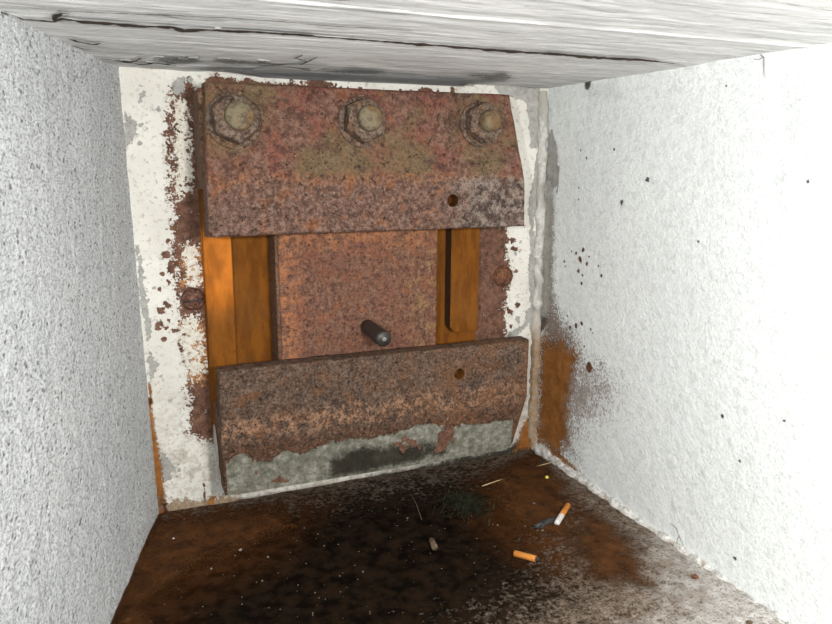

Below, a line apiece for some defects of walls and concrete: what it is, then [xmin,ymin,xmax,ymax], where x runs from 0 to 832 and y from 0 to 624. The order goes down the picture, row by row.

crack [1,5,682,66]
peeling [205,57,363,89]
peeling [123,111,144,147]
peeling [134,76,214,445]
peeling [160,453,181,483]
damp [371,418,532,476]
rust [488,308,651,588]